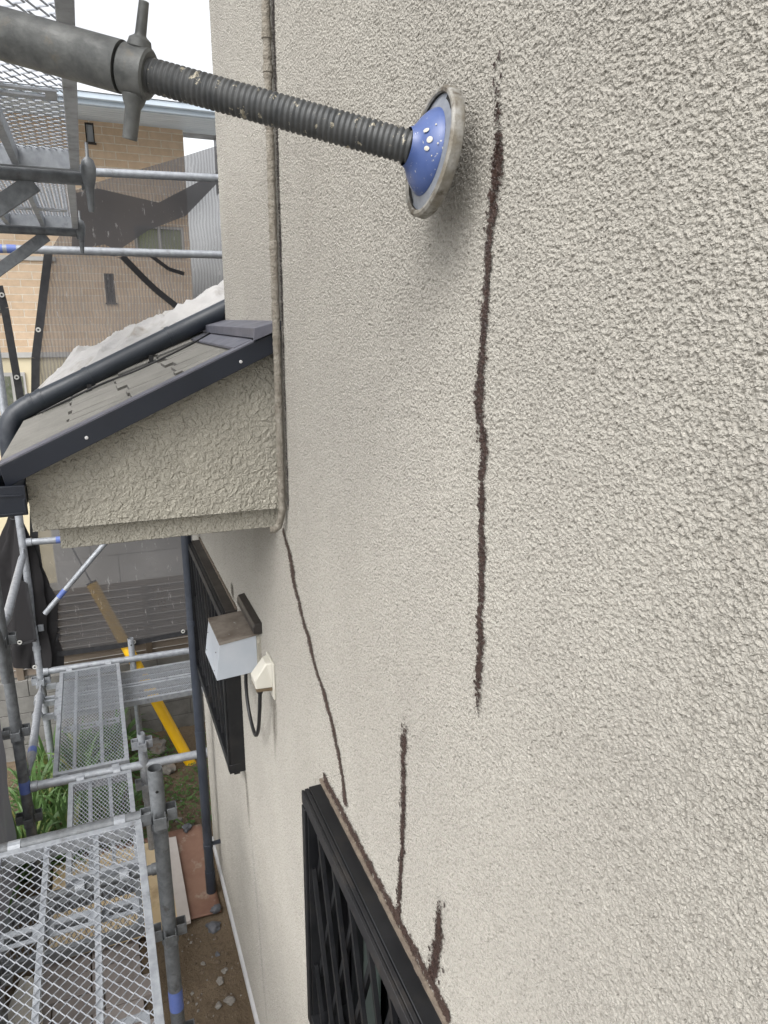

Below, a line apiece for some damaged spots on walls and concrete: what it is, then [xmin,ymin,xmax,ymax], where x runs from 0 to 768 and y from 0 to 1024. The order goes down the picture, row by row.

crack [472,50,504,714]
crack [282,529,347,806]
crack [395,716,409,917]
crack [427,888,445,986]